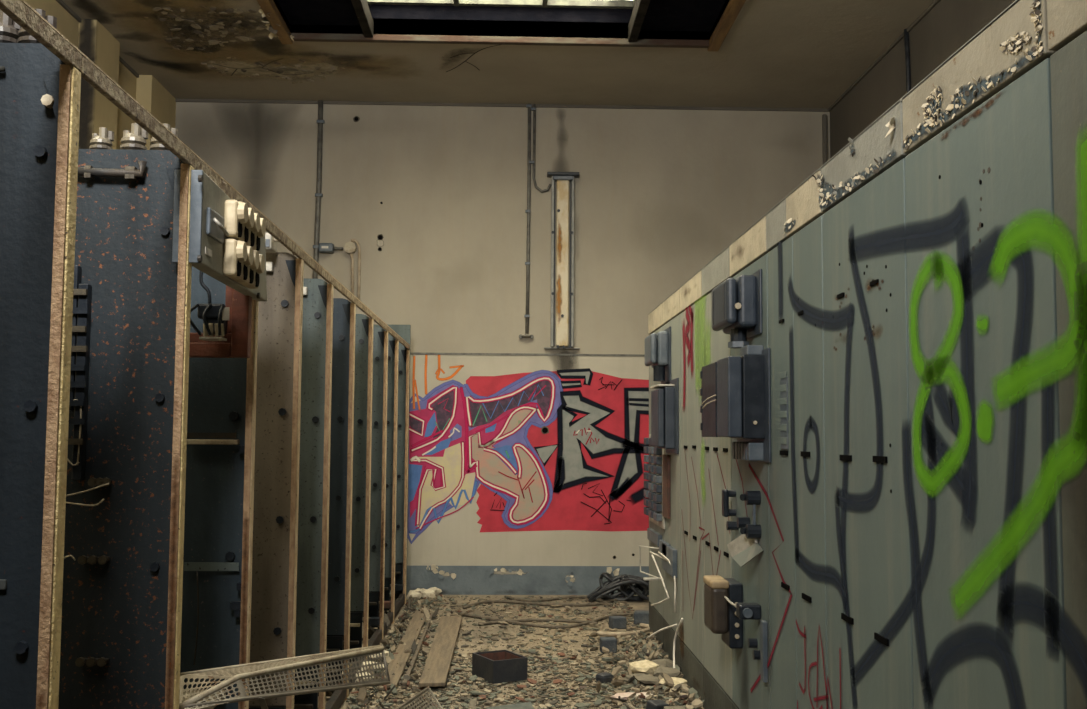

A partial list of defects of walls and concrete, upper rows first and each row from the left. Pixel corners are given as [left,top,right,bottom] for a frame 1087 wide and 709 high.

peeling [144,6,294,53]
leakage [118,0,382,72]
peeling [812,0,1043,208]